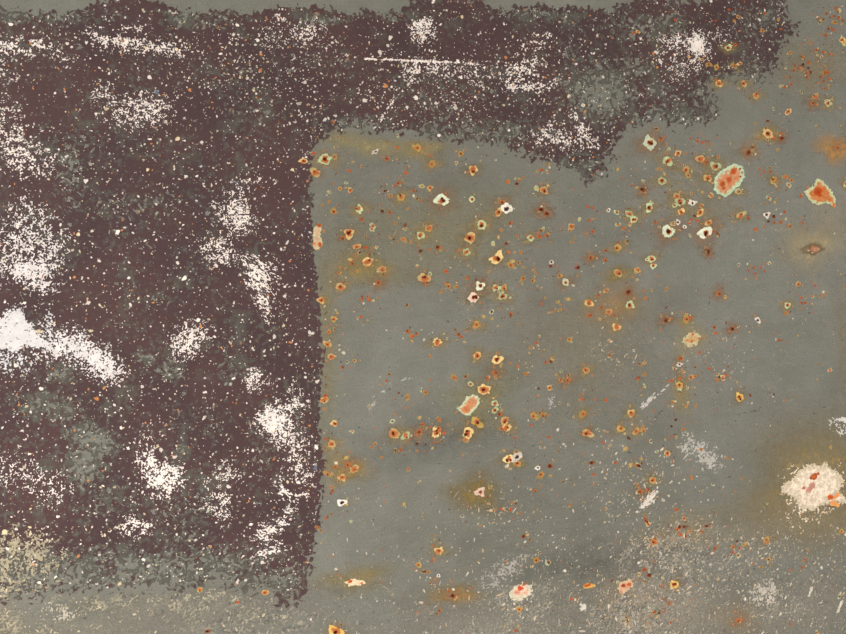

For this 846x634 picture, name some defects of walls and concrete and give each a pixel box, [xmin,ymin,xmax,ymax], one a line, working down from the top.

corrosion [312,134,497,377]
spalling [427,185,450,208]
spalling [465,276,508,302]
spalling [493,199,513,225]
spalling [489,242,521,269]
spalling [606,192,715,256]
corrosion [616,105,846,260]
spalling [468,355,517,439]
corrosion [324,209,788,510]
corrosion [753,436,846,535]
corrosion [595,457,750,633]
corrosion [503,582,533,632]